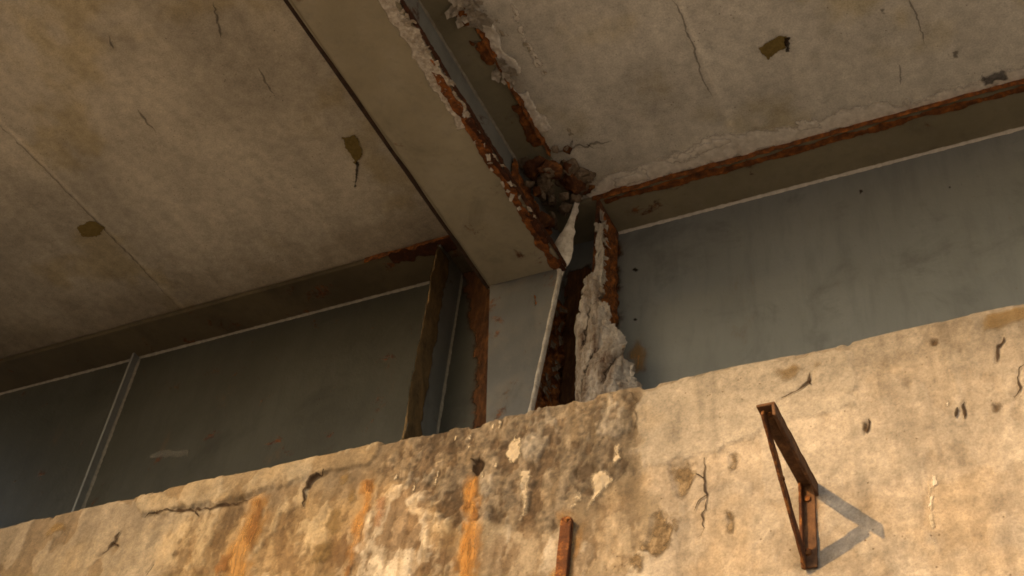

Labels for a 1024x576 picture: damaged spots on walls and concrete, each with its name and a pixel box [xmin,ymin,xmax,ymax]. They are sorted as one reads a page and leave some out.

peeling [379,0,471,130]
spalling [517,145,596,276]
rust [400,0,1024,429]
crack [145,495,257,517]
rust [214,498,264,576]
crack [302,469,324,507]
rust [459,458,484,576]
peeling [506,438,520,462]
peeling [574,471,611,505]
crack [694,457,708,537]